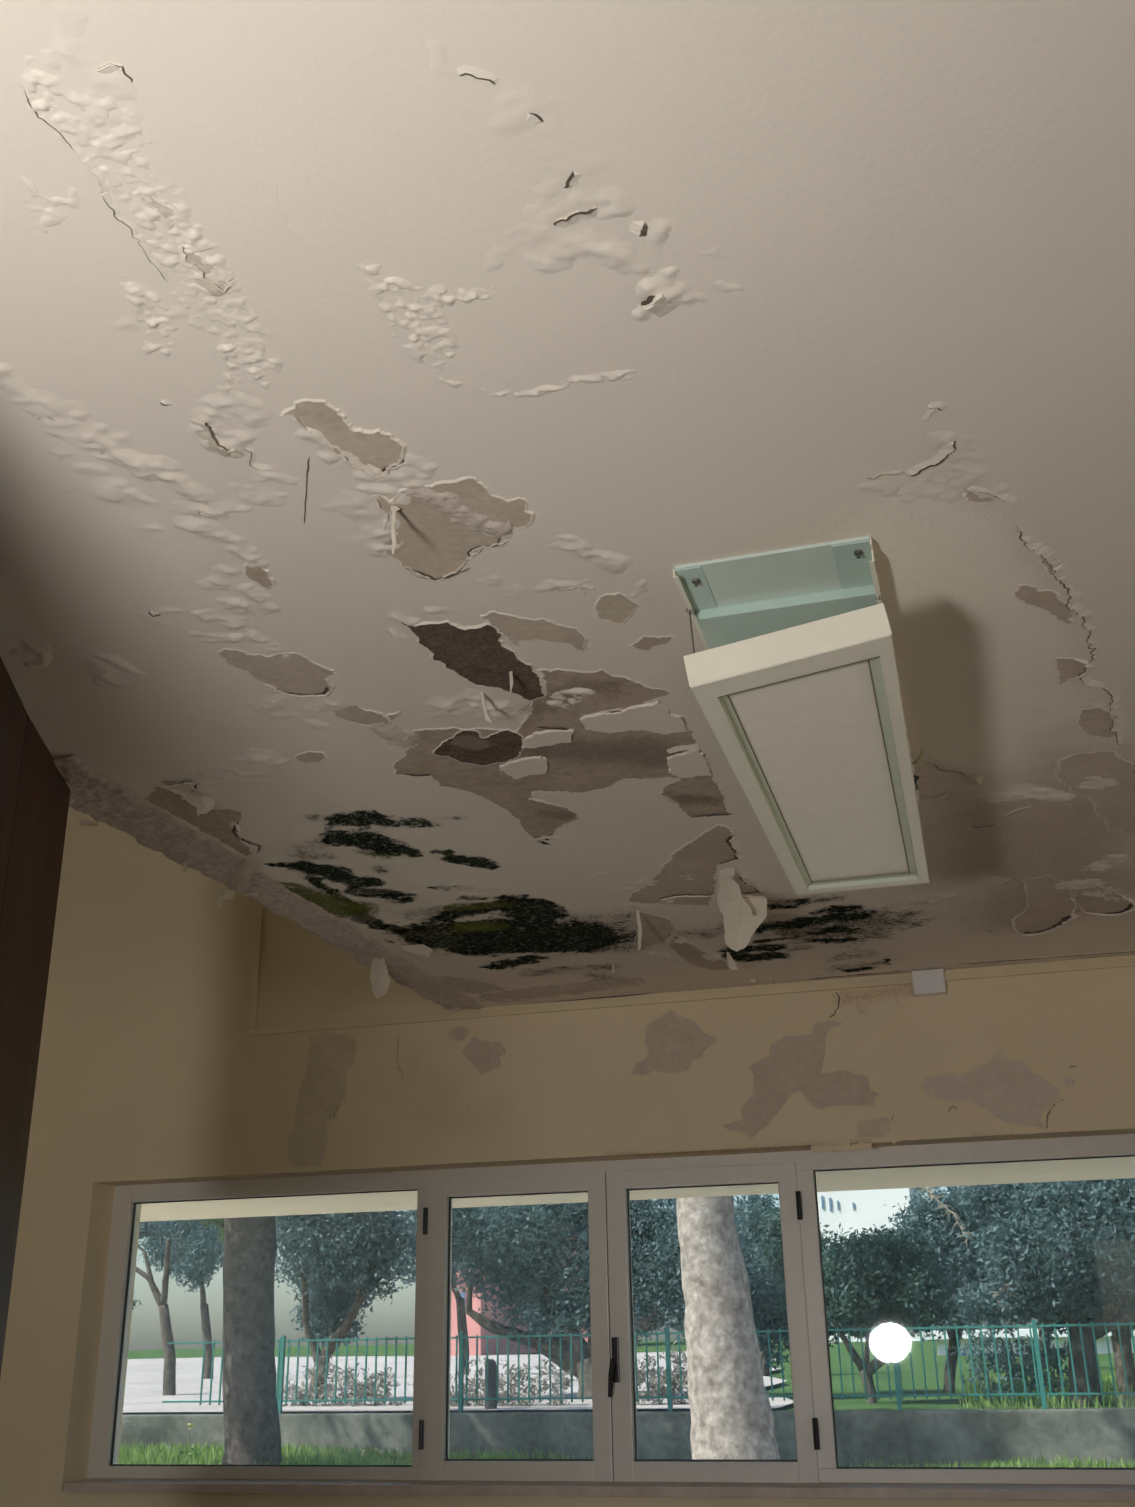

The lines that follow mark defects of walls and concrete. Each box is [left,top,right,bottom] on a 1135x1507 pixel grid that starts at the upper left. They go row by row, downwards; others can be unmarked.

peeling [243,561,276,590]
peeling [593,592,640,625]
peeling [217,648,401,728]
peeling [392,610,771,983]